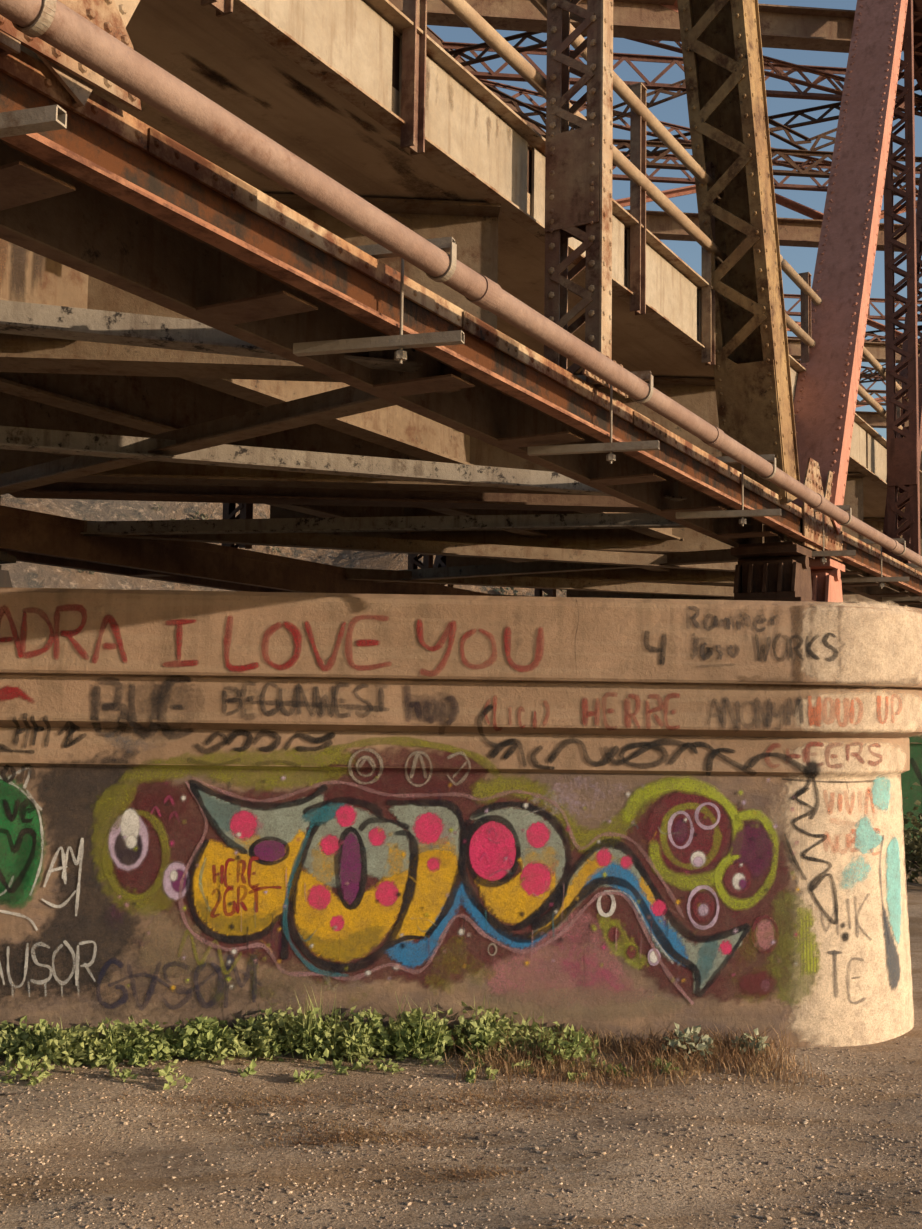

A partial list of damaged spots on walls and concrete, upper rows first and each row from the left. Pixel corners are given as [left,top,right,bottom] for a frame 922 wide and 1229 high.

corrosion [0,239,43,299]